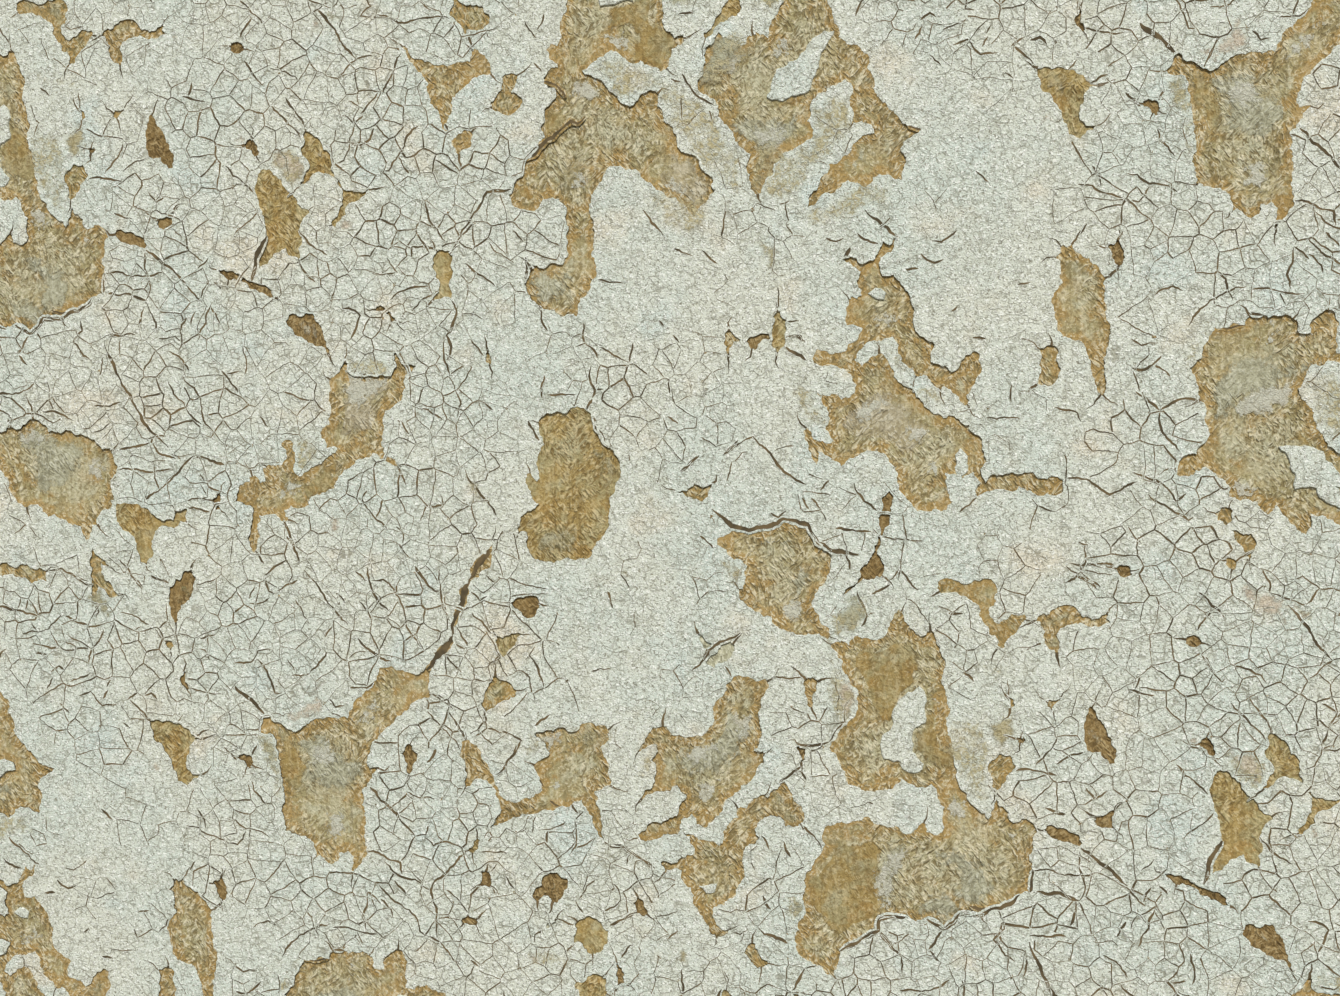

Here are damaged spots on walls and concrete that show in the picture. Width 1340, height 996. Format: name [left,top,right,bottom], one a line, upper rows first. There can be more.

peeling [0,0,184,333]
crack [304,0,586,287]
peeling [388,0,925,331]
peeling [1070,0,1340,246]
crack [0,249,249,500]
crack [199,470,497,710]
peeling [0,94,1129,996]
crack [680,436,871,570]
peeling [1160,296,1340,586]
crack [235,749,479,996]
crack [758,848,1198,996]
peeling [1153,696,1340,996]